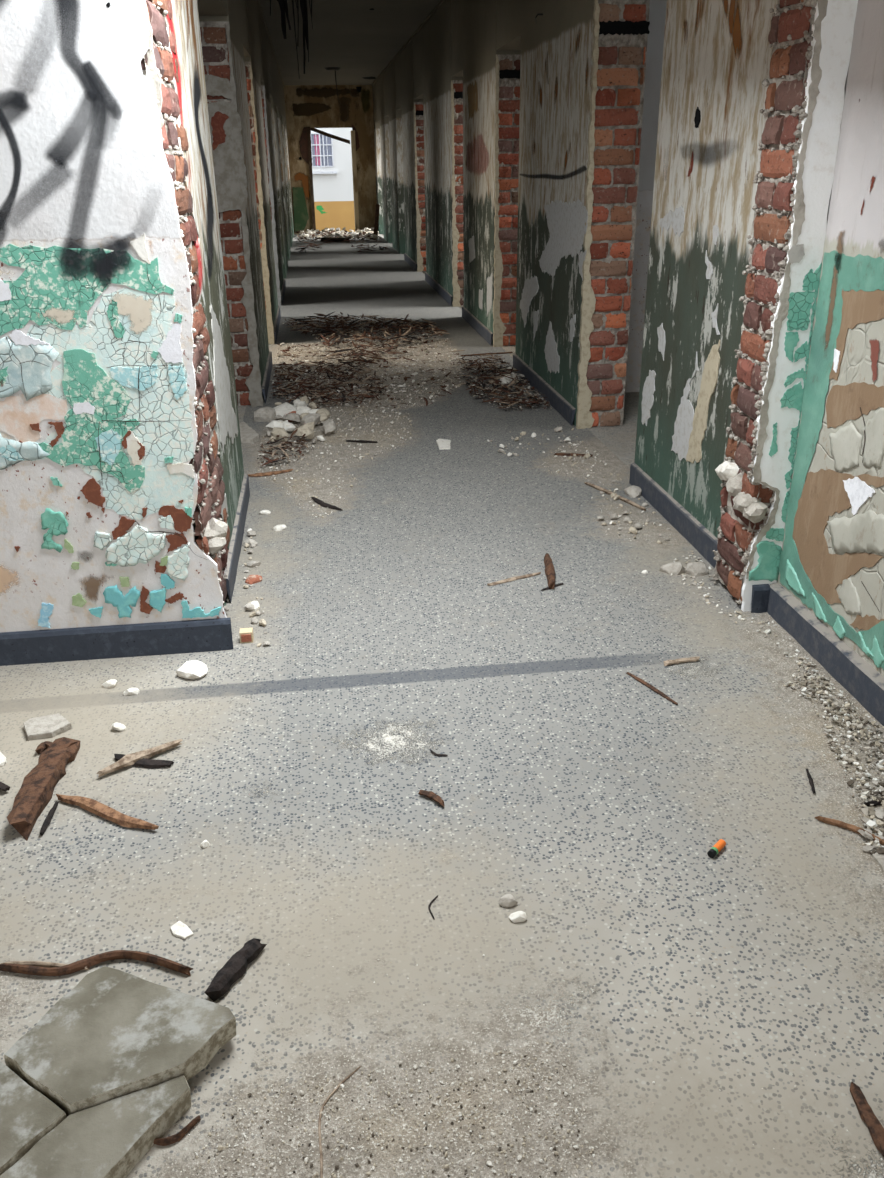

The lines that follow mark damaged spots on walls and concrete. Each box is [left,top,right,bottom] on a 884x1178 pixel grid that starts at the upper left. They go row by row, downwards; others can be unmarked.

spalling [499,69,520,79]
spalling [599,20,650,35]
peeling [205,74,248,212]
crack [0,336,49,399]
peeling [0,0,238,618]
crack [62,255,183,486]
peeling [641,323,666,426]
flaking render [671,0,884,670]
peeling [38,603,54,628]